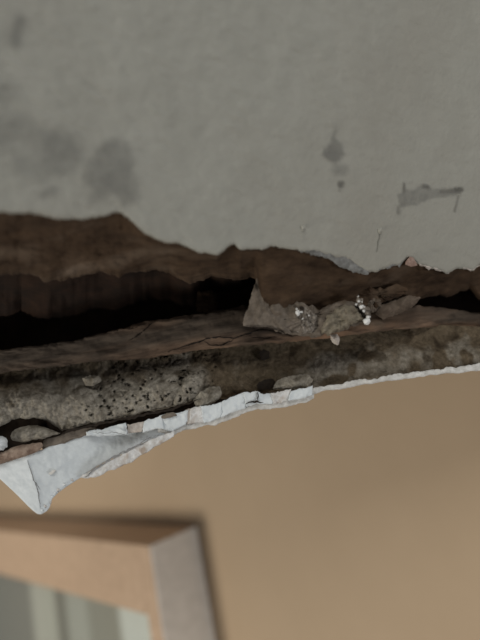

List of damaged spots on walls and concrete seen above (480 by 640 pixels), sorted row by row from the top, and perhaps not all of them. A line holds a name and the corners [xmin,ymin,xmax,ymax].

flaking render [0,212,480,514]